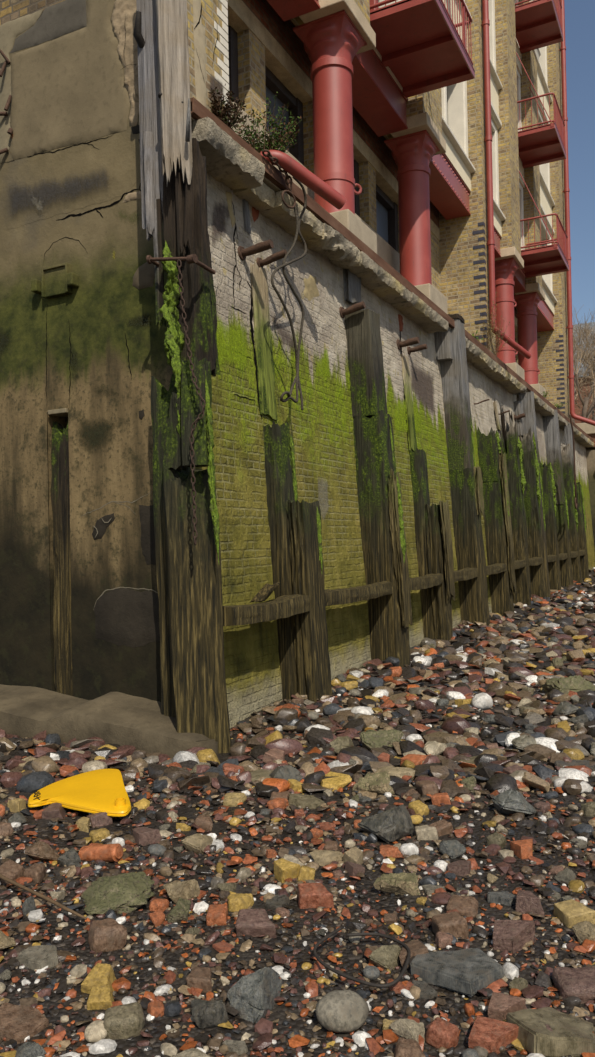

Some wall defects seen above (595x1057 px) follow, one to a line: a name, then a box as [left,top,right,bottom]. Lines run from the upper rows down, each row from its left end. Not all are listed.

crack [0,136,110,164]
crack [43,183,141,264]